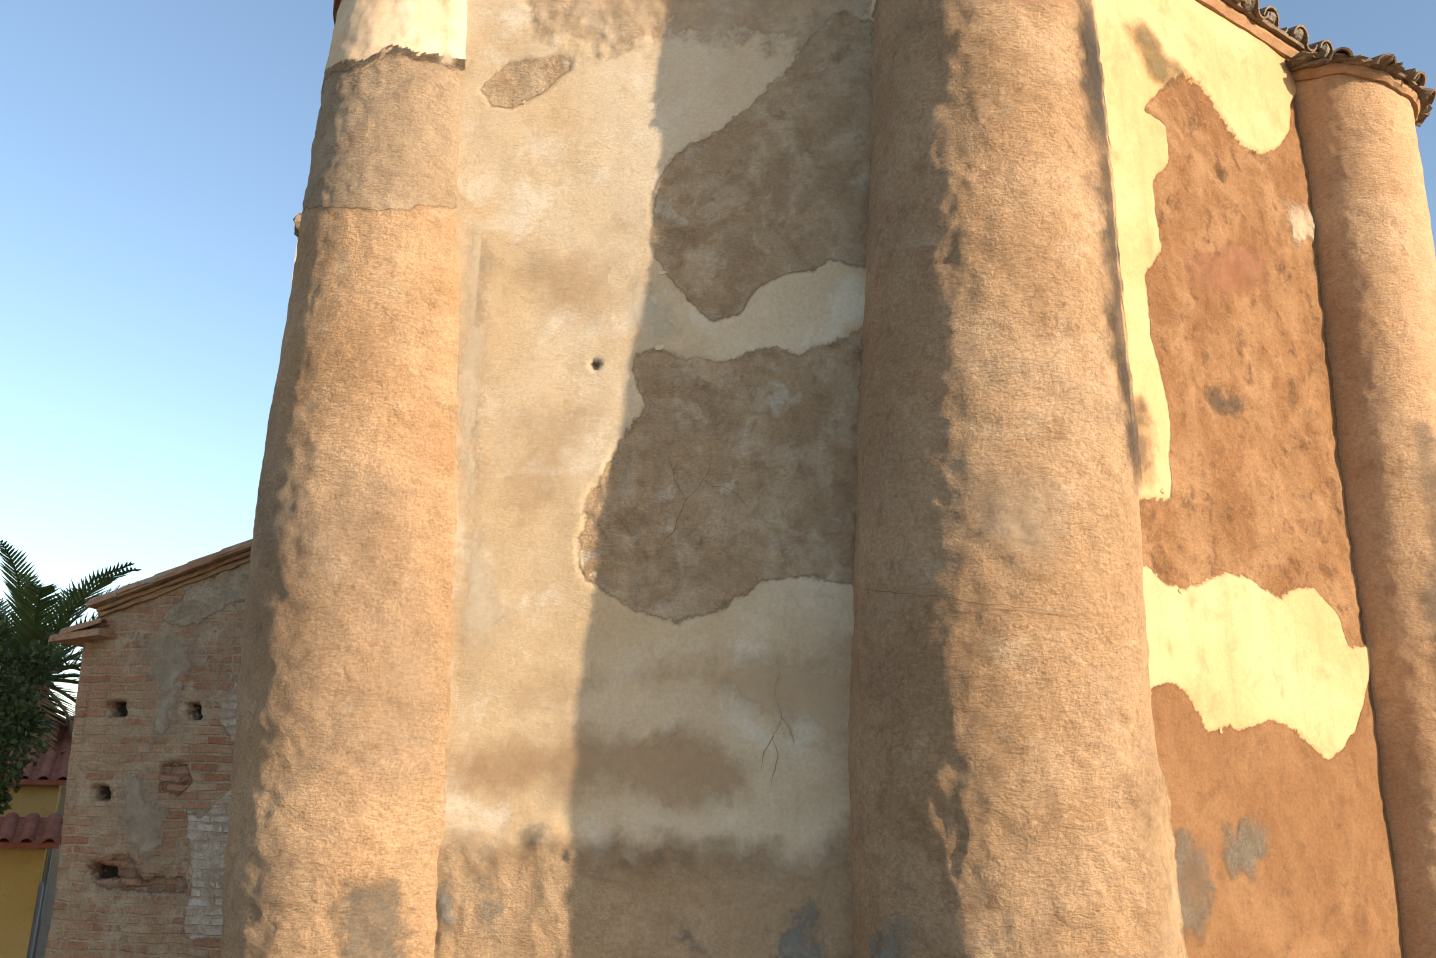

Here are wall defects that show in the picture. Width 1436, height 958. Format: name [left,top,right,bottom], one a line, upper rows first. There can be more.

spalling [303,0,467,211]
peeling [482,55,572,108]
peeling [531,0,876,321]
peeling [579,282,863,624]
leakage [1081,0,1151,473]
peeling [1139,73,1366,648]
peeling [87,789,231,940]
leakage [468,733,739,801]
crack [761,649,794,790]
peeling [1151,674,1404,958]